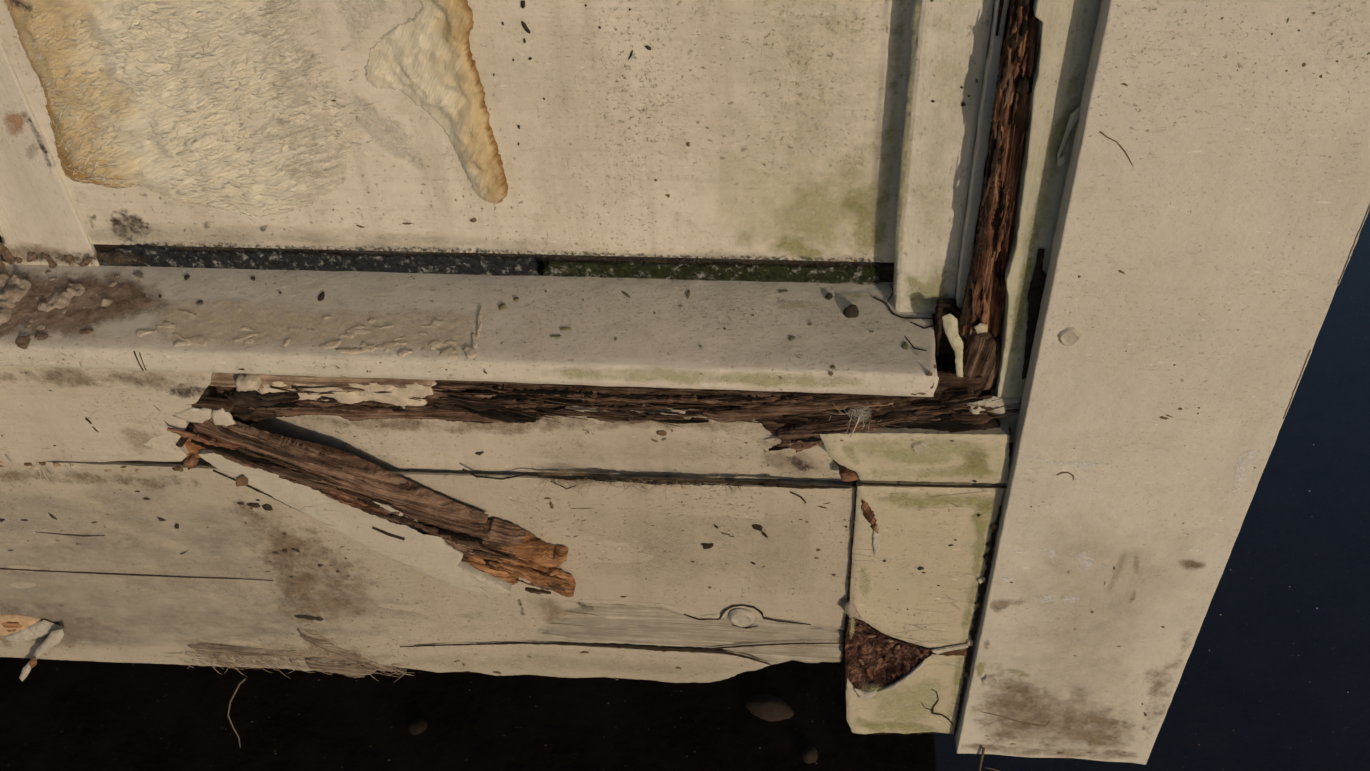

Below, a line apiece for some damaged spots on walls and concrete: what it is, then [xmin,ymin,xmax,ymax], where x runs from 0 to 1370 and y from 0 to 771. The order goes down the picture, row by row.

peeling [974,323,988,334]
peeling [256,369,448,409]
peeling [155,406,236,426]
peeling [966,396,1020,414]
peeling [839,466,860,482]
peeling [235,475,291,537]
peeling [480,518,527,548]
peeling [861,499,886,562]
peeling [295,615,324,637]
peeling [0,614,64,682]